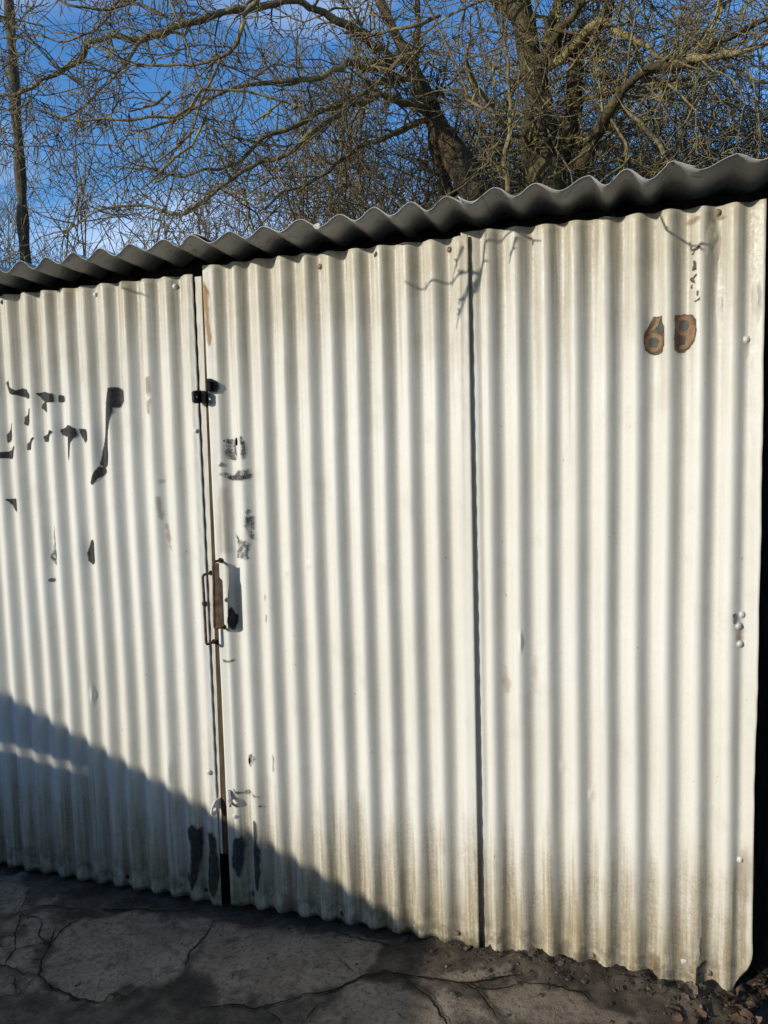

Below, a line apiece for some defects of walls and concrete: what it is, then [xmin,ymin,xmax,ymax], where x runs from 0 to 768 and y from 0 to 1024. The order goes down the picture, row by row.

peeling [0,429,14,459]
peeling [6,381,87,460]
peeling [219,436,251,481]
peeling [87,539,95,564]
peeling [237,509,255,559]
peeling [232,821,261,891]
crack [0,889,214,1003]
crack [203,932,597,1024]